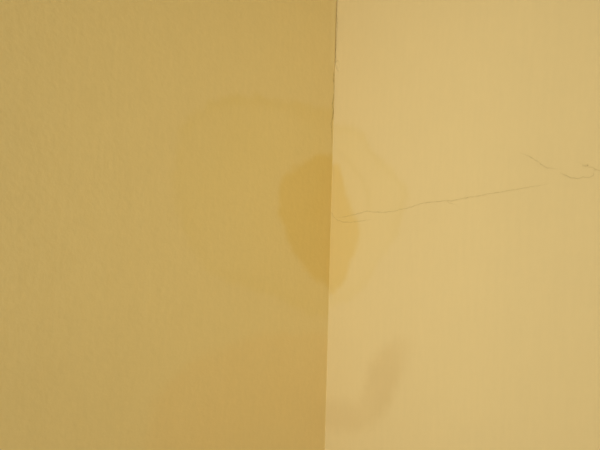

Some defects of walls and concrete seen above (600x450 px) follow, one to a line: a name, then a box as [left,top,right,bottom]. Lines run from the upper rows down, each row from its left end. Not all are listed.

leakage [139,88,421,450]
crack [332,152,600,223]